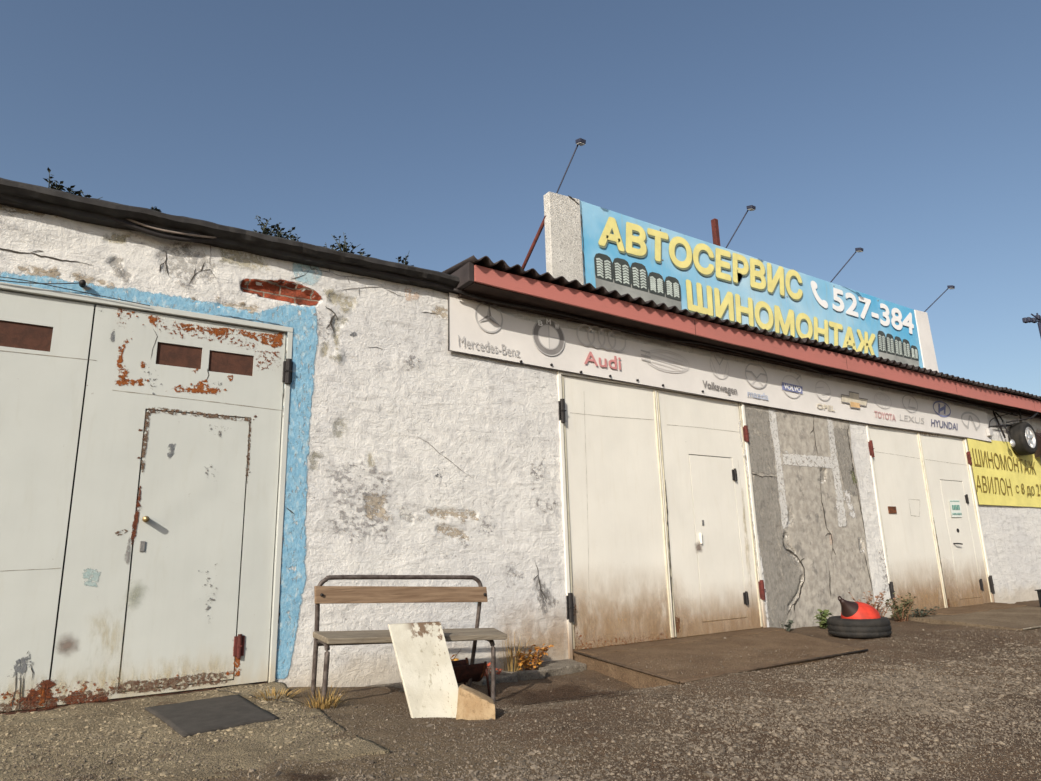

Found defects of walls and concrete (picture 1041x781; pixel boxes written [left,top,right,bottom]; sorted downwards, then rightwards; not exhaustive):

flaking render [160,243,332,339]
corrosion [115,338,149,386]
corrosion [117,308,284,370]
corrosion [172,368,233,394]
corrosion [137,407,257,476]
corrosion [115,486,141,544]
peeling [329,464,479,546]
peeling [738,402,880,629]
crack [847,427,873,590]
crack [783,494,836,615]
corrosion [0,647,241,712]